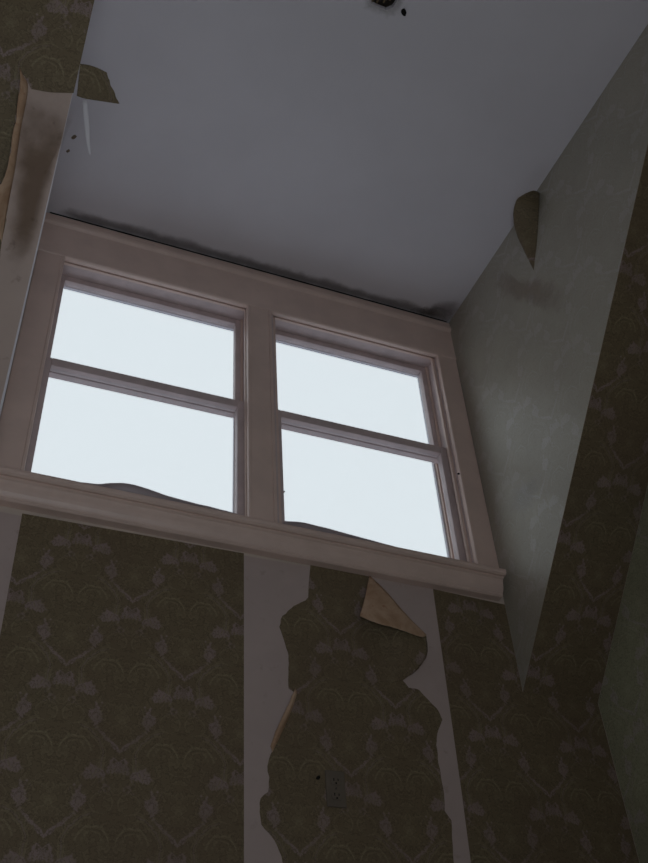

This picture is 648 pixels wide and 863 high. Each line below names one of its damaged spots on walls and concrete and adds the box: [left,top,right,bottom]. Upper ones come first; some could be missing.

flaking render [0,75,77,403]
flaking render [0,512,22,633]
flaking render [244,555,310,863]
flaking render [373,578,471,863]